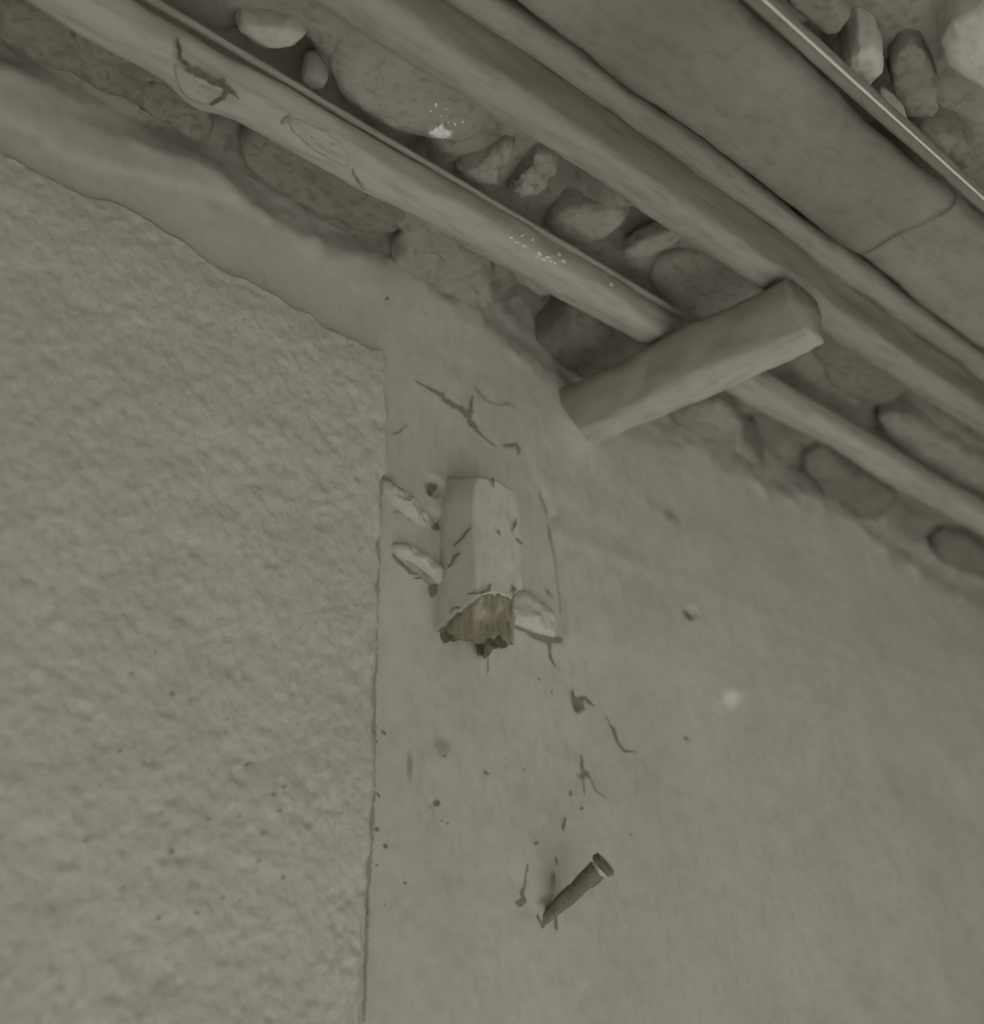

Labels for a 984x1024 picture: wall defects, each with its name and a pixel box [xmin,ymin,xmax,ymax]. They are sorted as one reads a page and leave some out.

crack [176,38,239,106]
crack [414,380,521,455]
crack [605,715,636,753]
crack [580,754,608,800]